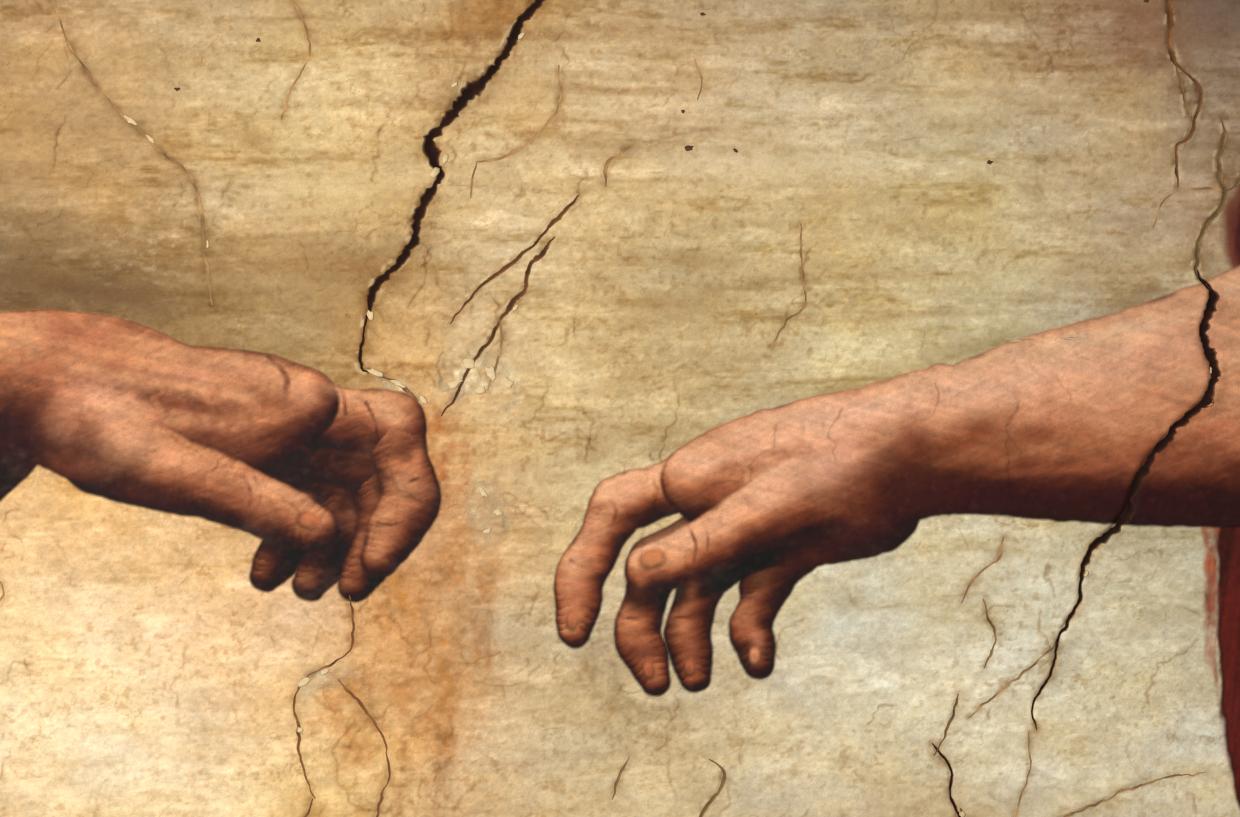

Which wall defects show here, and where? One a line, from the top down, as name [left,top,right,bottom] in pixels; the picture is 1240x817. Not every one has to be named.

crack [51,0,213,305]
crack [358,0,636,416]
crack [694,59,703,100]
crack [771,223,807,348]
crack [932,0,1240,817]
crack [293,596,391,817]
crack [612,757,630,800]
crack [699,759,726,817]